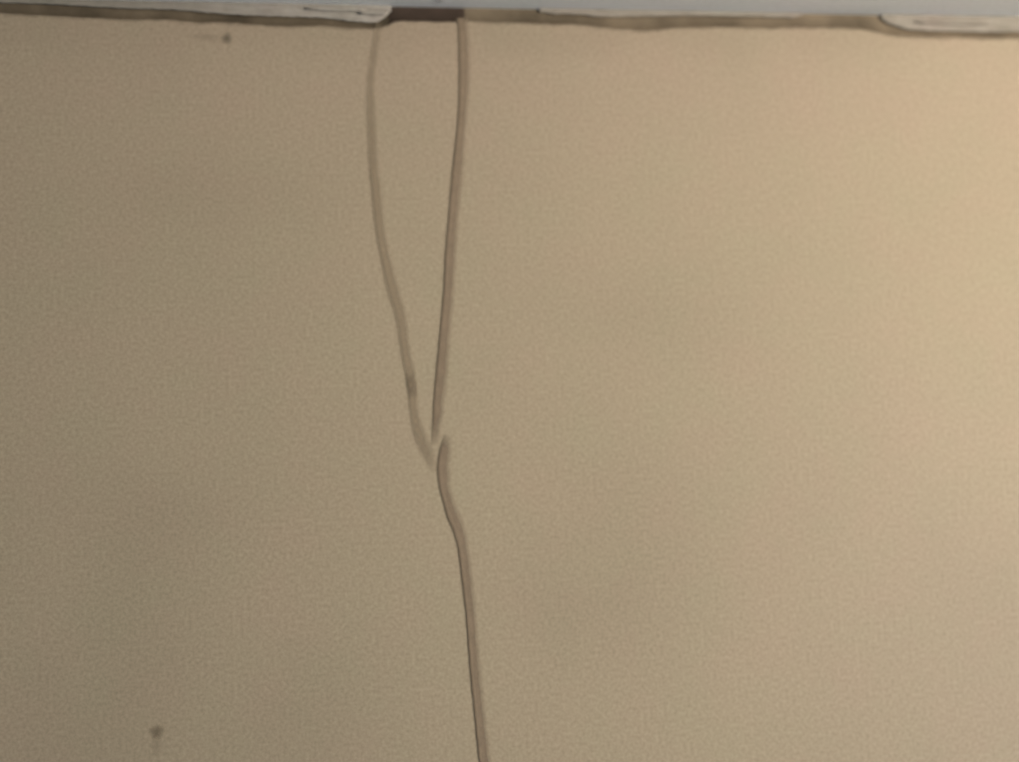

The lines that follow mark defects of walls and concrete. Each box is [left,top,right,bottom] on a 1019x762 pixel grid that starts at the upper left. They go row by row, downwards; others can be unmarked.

crack [0,3,390,28]
crack [369,8,1019,762]